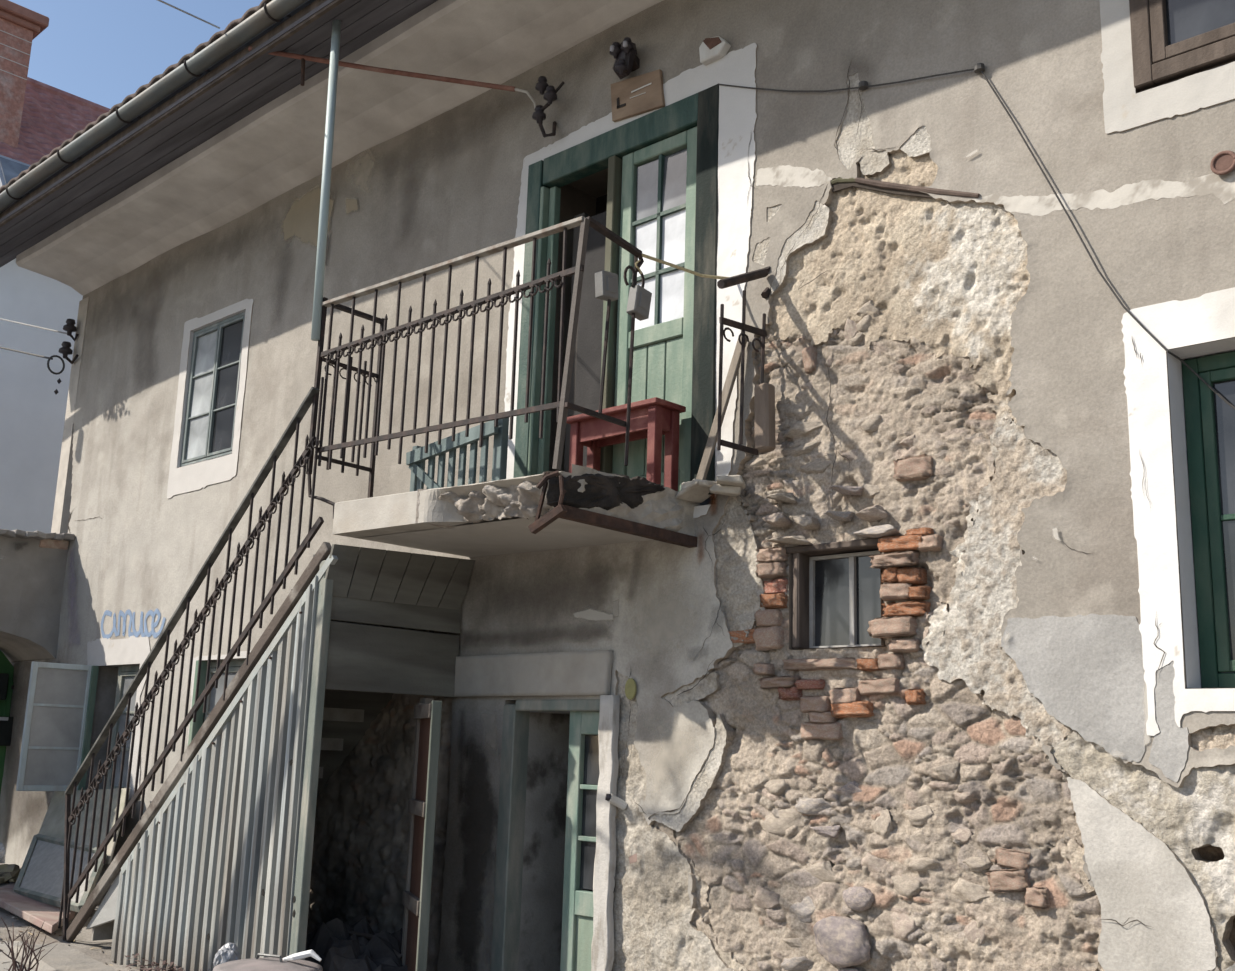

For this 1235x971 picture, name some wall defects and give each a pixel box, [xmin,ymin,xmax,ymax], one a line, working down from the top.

peeling [282,154,374,257]
spalling [415,464,632,528]
spalling [579,487,700,536]
spalling [612,73,1105,971]
peeling [1149,661,1192,782]
water stain [457,714,497,971]